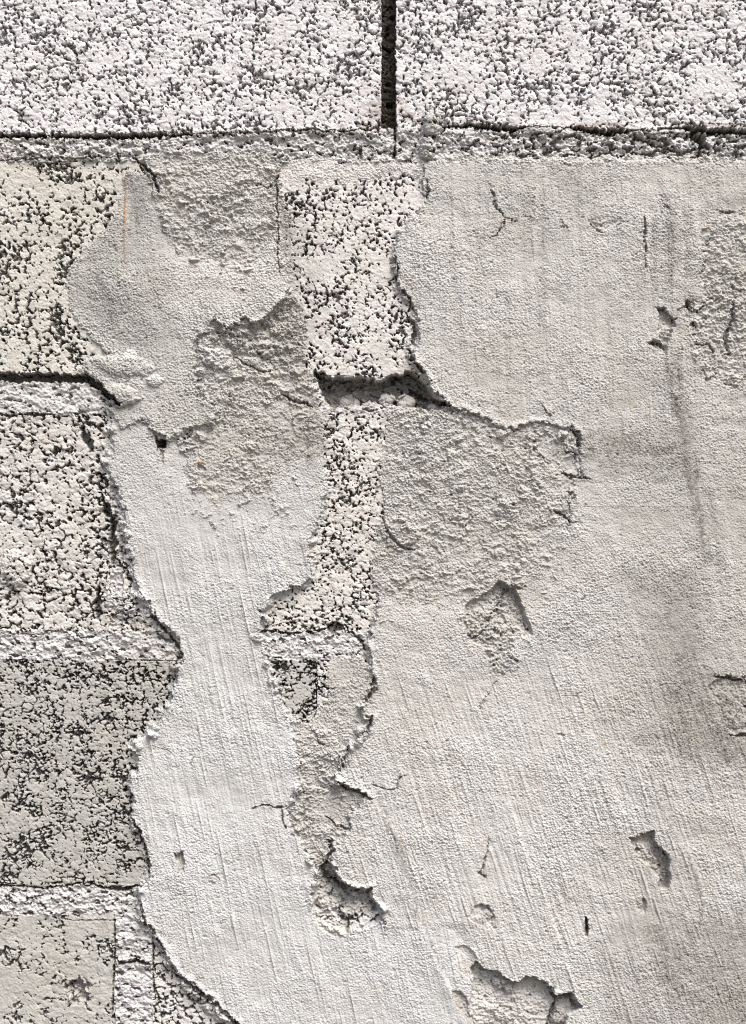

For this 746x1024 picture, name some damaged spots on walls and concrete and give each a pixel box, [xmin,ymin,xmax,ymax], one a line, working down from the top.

crack [489,183,572,239]
spalling [205,285,309,375]
peeling [132,575,191,679]
spalling [462,580,534,678]
peeling [253,551,381,803]
spalling [128,815,152,876]
spalling [173,851,185,875]
crack [250,803,289,831]
spalling [313,816,389,941]
spalling [628,830,672,892]
spalling [64,975,97,1007]
spalling [451,944,583,1024]